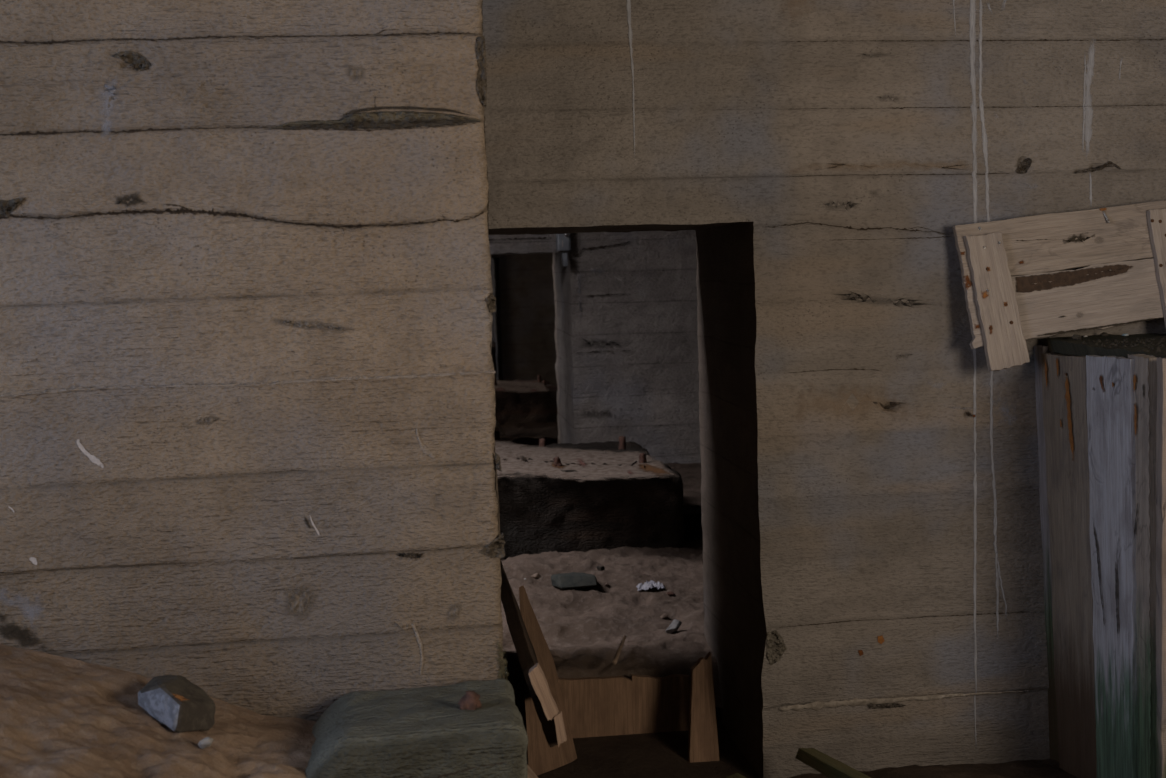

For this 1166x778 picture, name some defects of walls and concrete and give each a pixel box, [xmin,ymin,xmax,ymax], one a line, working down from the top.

spalling [269,97,480,132]
spalling [476,36,487,107]
water stain [888,0,992,223]
water stain [1082,45,1094,153]
spalling [0,197,26,219]
crack [9,204,550,240]
water stain [973,348,1011,741]